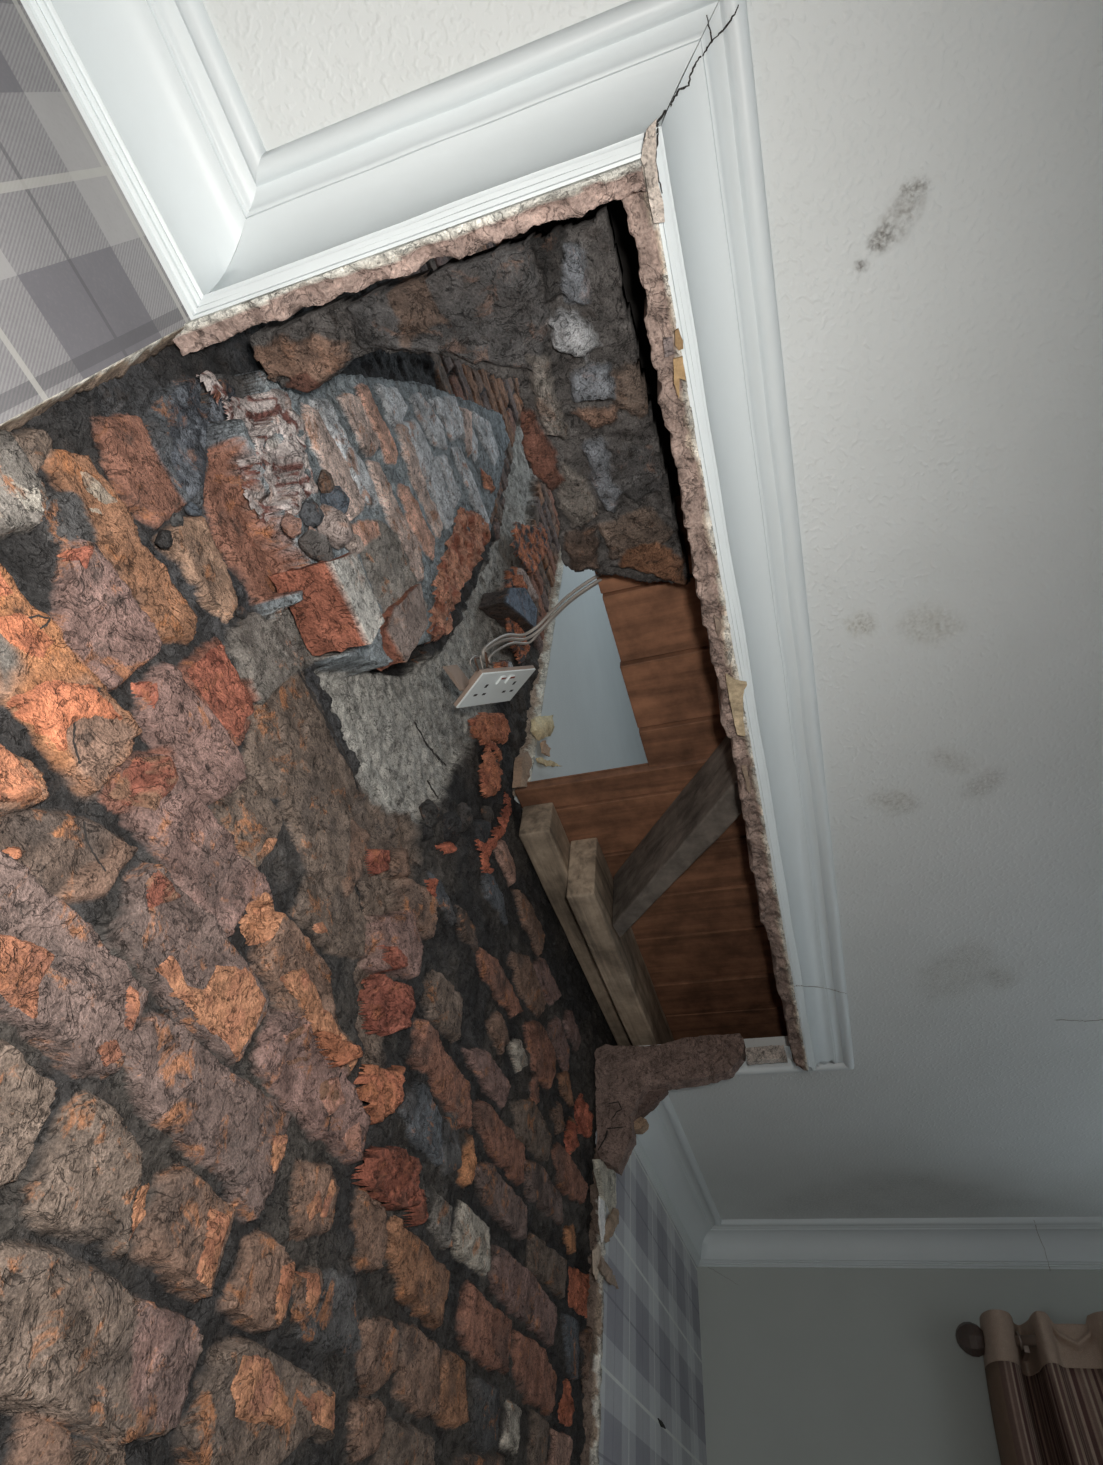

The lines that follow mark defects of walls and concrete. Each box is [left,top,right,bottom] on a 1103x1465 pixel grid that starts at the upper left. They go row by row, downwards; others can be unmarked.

crack [643,4,739,193]
flaking render [0,119,809,1465]